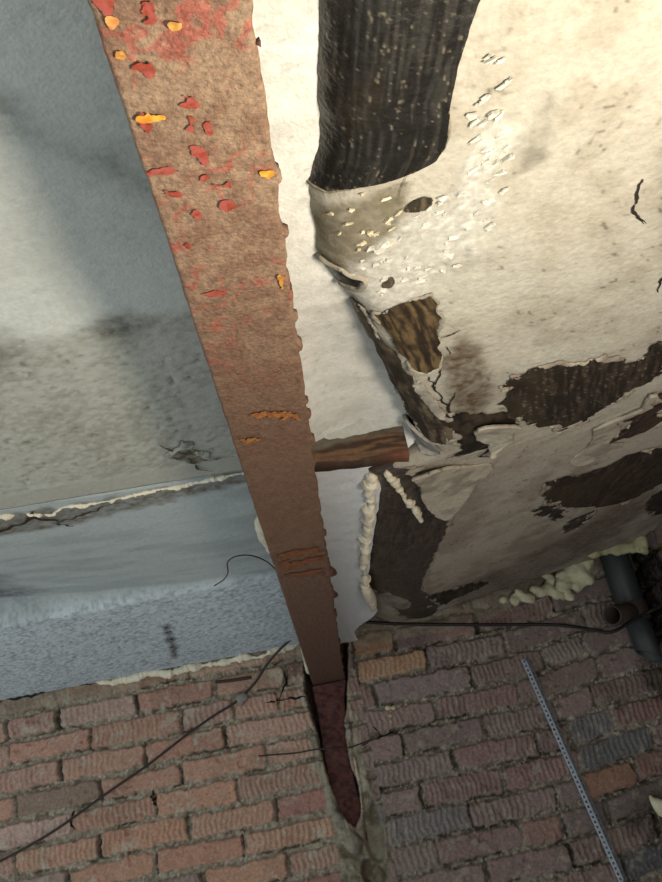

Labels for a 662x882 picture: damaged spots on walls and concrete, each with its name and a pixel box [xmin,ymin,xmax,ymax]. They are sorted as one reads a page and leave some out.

flaking render [306,0,480,197]
leakage [314,193,404,269]
crack [428,330,460,413]
peeling [314,77,662,619]
spalling [164,441,211,465]
crack [0,504,112,533]